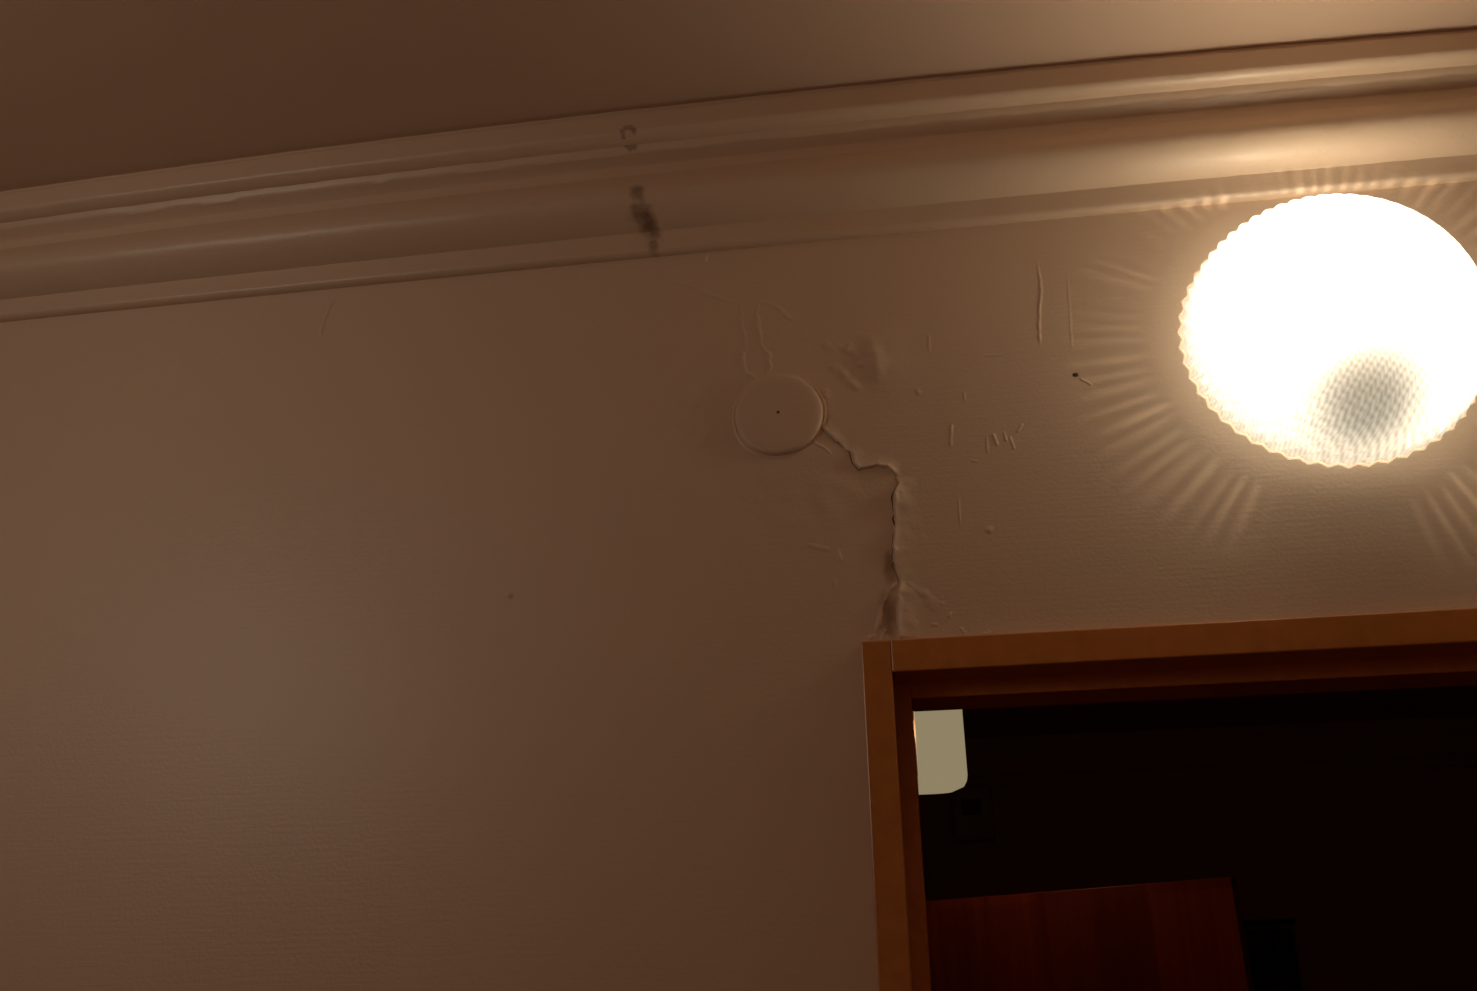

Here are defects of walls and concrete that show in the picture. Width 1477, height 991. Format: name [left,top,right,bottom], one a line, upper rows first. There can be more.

peeling [813,420,944,640]